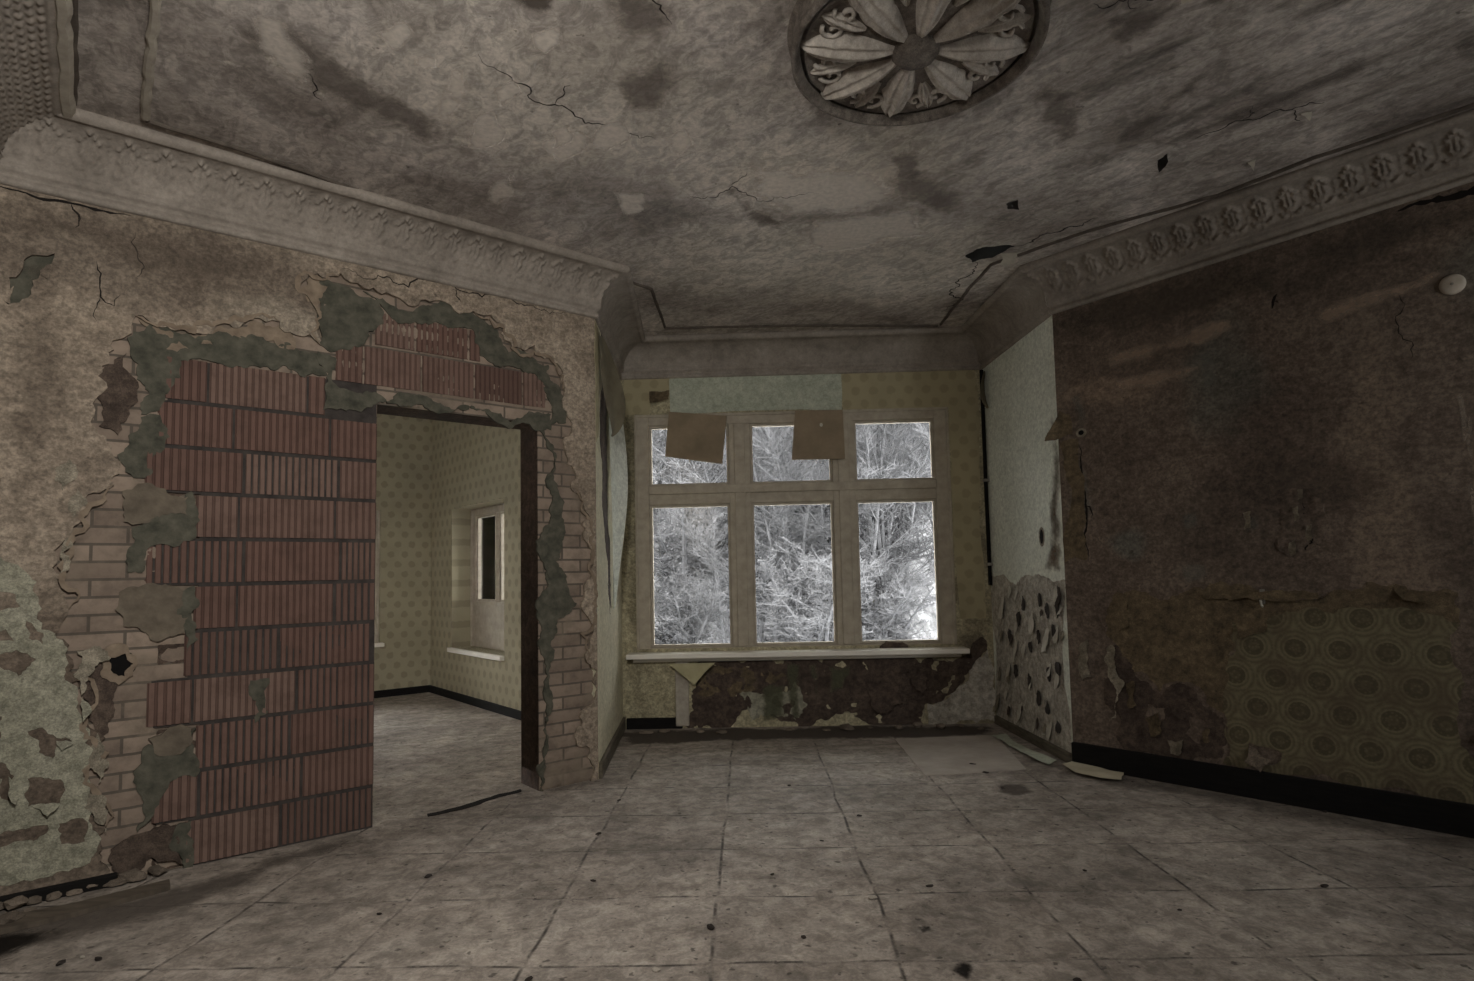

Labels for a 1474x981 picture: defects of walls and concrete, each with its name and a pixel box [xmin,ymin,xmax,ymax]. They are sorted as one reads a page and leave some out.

water stain [519,0,552,10]
water stain [259,18,306,77]
water stain [534,30,559,51]
water stain [618,194,644,214]
water stain [758,167,924,250]
spalling [2,255,54,304]
spalling [0,270,611,886]
spalling [687,574,1228,760]